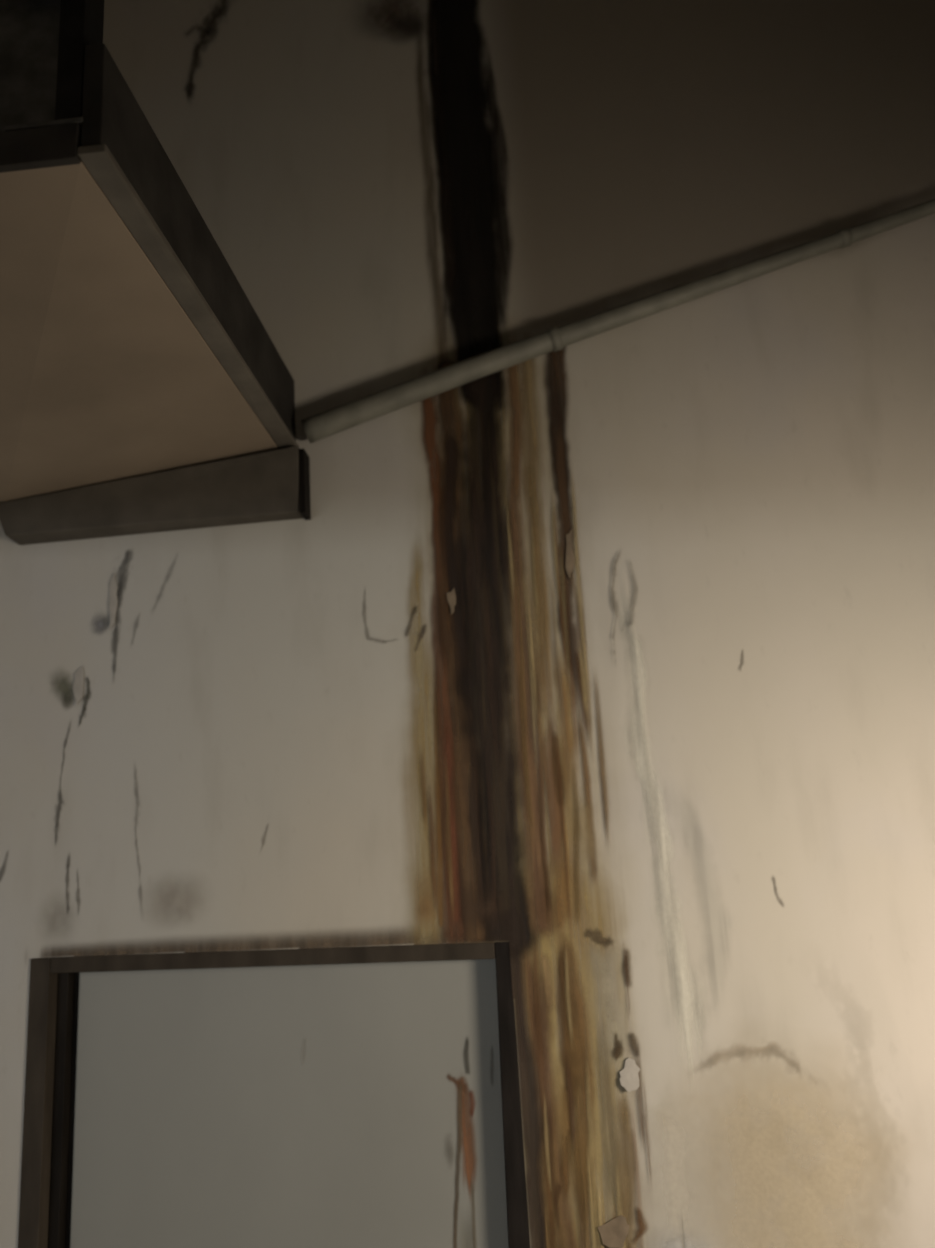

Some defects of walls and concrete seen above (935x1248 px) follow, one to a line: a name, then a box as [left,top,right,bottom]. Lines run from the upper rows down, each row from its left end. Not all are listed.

crack [187,0,227,97]
water stain [370,0,511,362]
crack [55,792,79,910]
crack [406,607,425,649]
rust [413,347,650,1248]
water stain [618,566,690,1047]